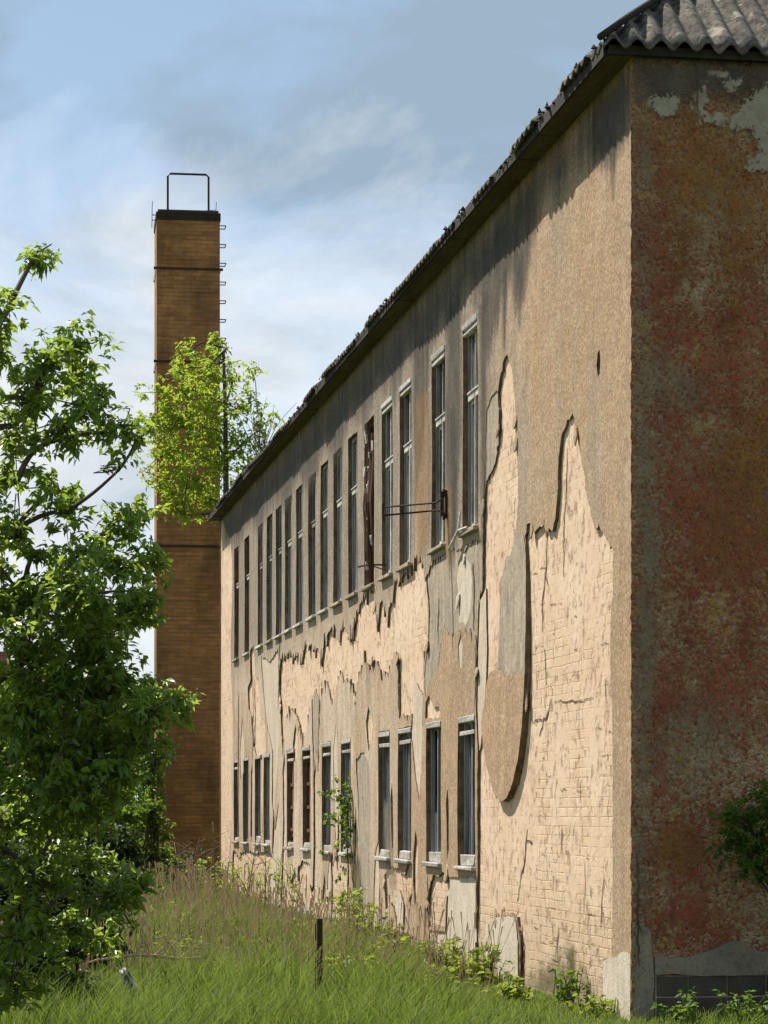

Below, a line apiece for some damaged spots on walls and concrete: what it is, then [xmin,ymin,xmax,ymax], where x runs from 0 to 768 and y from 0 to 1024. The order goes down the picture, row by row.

water stain [579,60,768,178]
peeling [647,68,768,173]
water stain [224,152,566,557]
flaking render [221,357,631,1020]
crack [533,649,606,736]